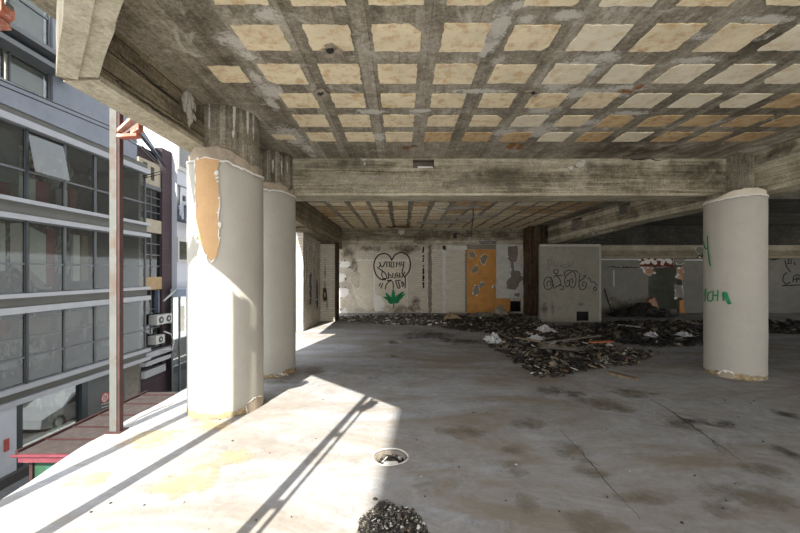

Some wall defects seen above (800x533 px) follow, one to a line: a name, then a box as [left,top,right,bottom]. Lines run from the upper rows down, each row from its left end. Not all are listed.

flaking render [186,156,296,263]
flaking render [506,245,523,297]
peeling [639,258,685,313]
crack [562,431,640,519]